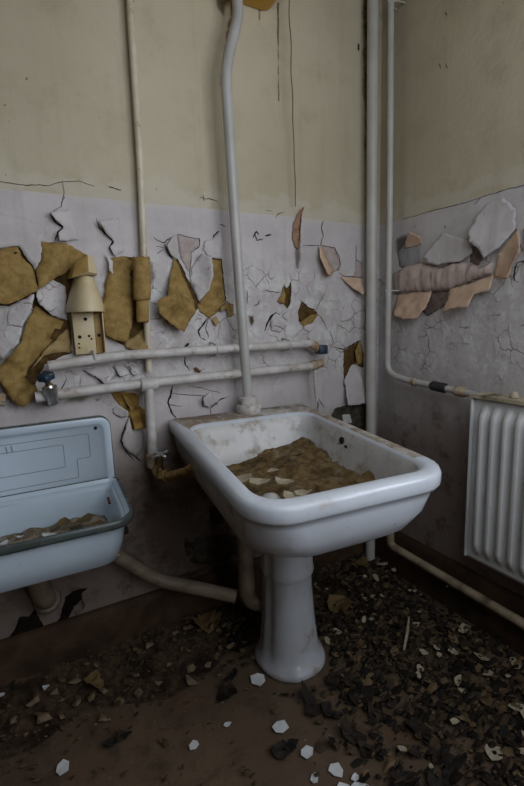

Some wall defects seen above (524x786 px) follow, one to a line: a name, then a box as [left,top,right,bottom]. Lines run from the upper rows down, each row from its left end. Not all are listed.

crack [0,180,120,200]
peeling [0,196,86,407]
peeling [96,218,234,350]
peeling [304,222,365,295]
peeling [392,198,523,319]
peeling [84,365,139,384]
peeling [332,340,366,431]
peeling [111,391,146,461]
spalling [9,609,44,637]
spalling [57,588,87,622]